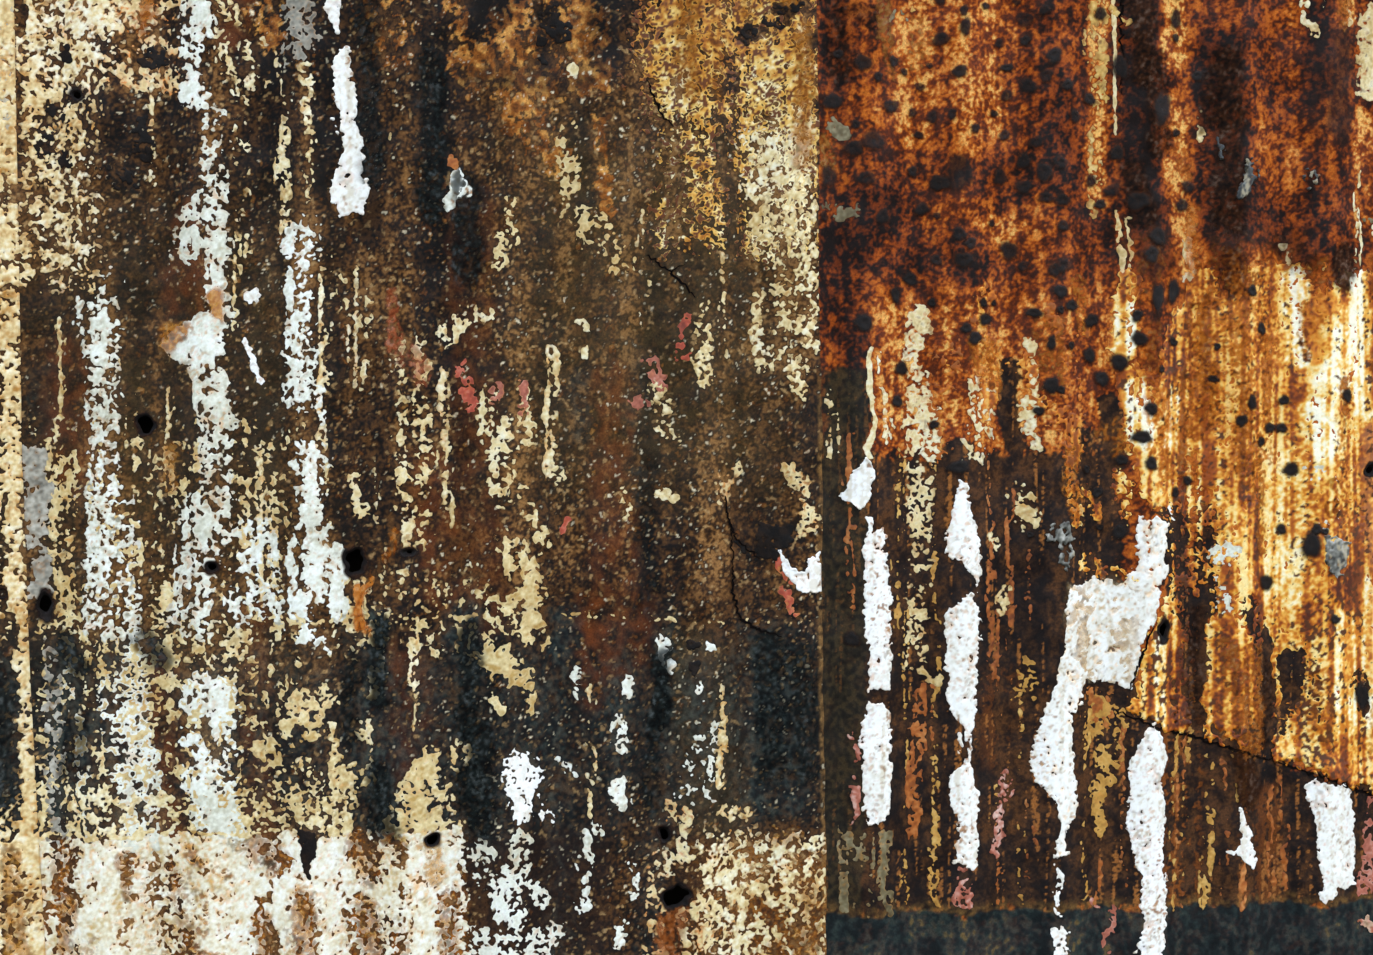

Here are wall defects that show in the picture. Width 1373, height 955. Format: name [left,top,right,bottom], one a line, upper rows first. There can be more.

rust [1332,242,1356,292]
peeling [0,0,635,955]
crack [725,496,782,637]
rust [841,433,857,612]
peeling [555,0,1373,955]
rust [984,461,1032,692]
rust [1147,389,1173,478]
rust [1339,377,1352,415]
rust [905,683,936,840]
rust [1080,687,1128,905]
rust [1219,819,1247,912]
rust [1219,646,1291,898]